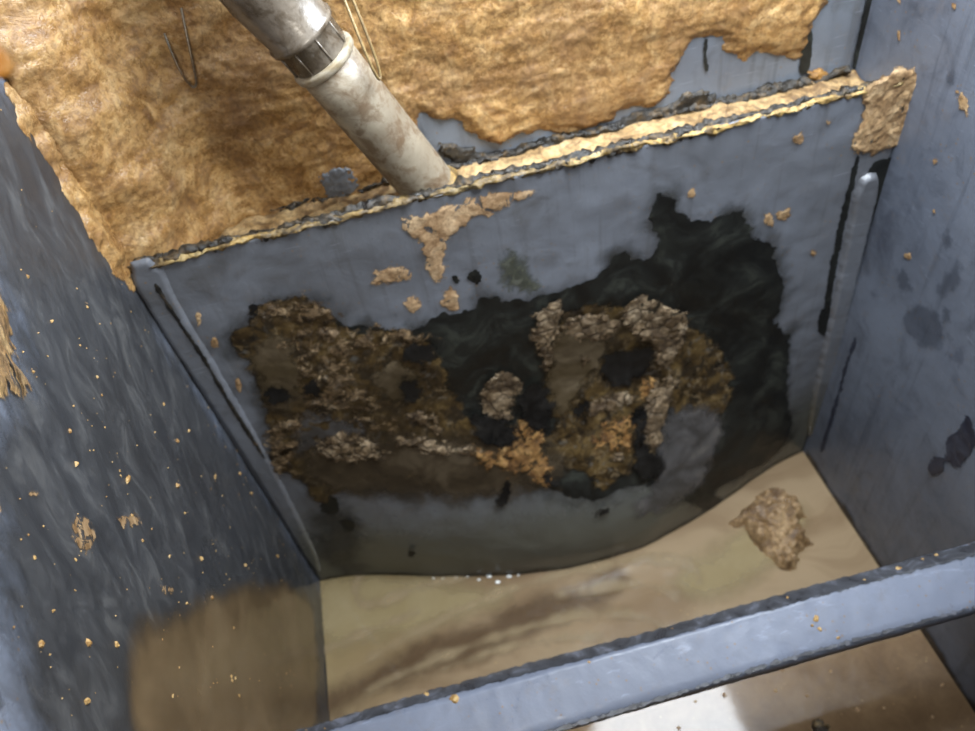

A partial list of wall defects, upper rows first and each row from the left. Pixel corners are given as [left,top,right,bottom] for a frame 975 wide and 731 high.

rust [4,81,136,292]
rust [401,190,535,313]
rust [0,294,46,399]
peeling [248,290,344,330]
spalling [343,323,438,366]
peeling [262,411,399,479]
damp [0,92,892,731]
rust [473,420,554,488]
spalling [469,299,722,517]
rust [591,415,637,457]
damp [927,415,975,476]
damp [920,628,975,712]